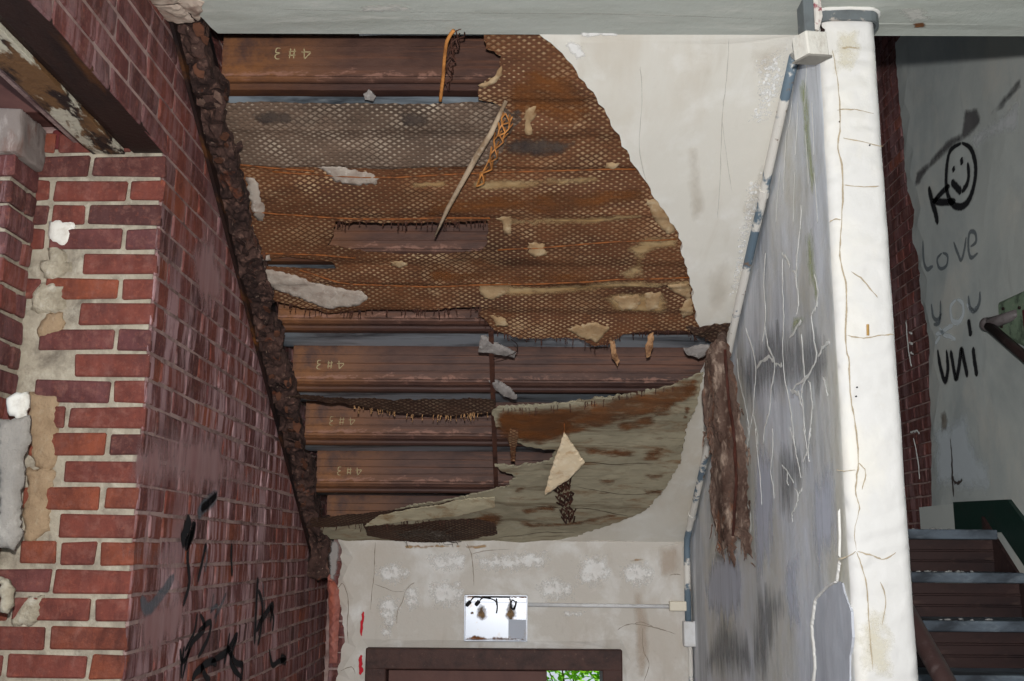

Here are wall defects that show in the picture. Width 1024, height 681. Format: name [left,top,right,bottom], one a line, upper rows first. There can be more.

peeling [567,33,617,58]
rust [511,71,586,120]
water stain [747,320,821,392]
crack [737,46,896,667]
rust [498,380,697,444]
water stain [748,452,801,569]
water stain [706,554,774,668]